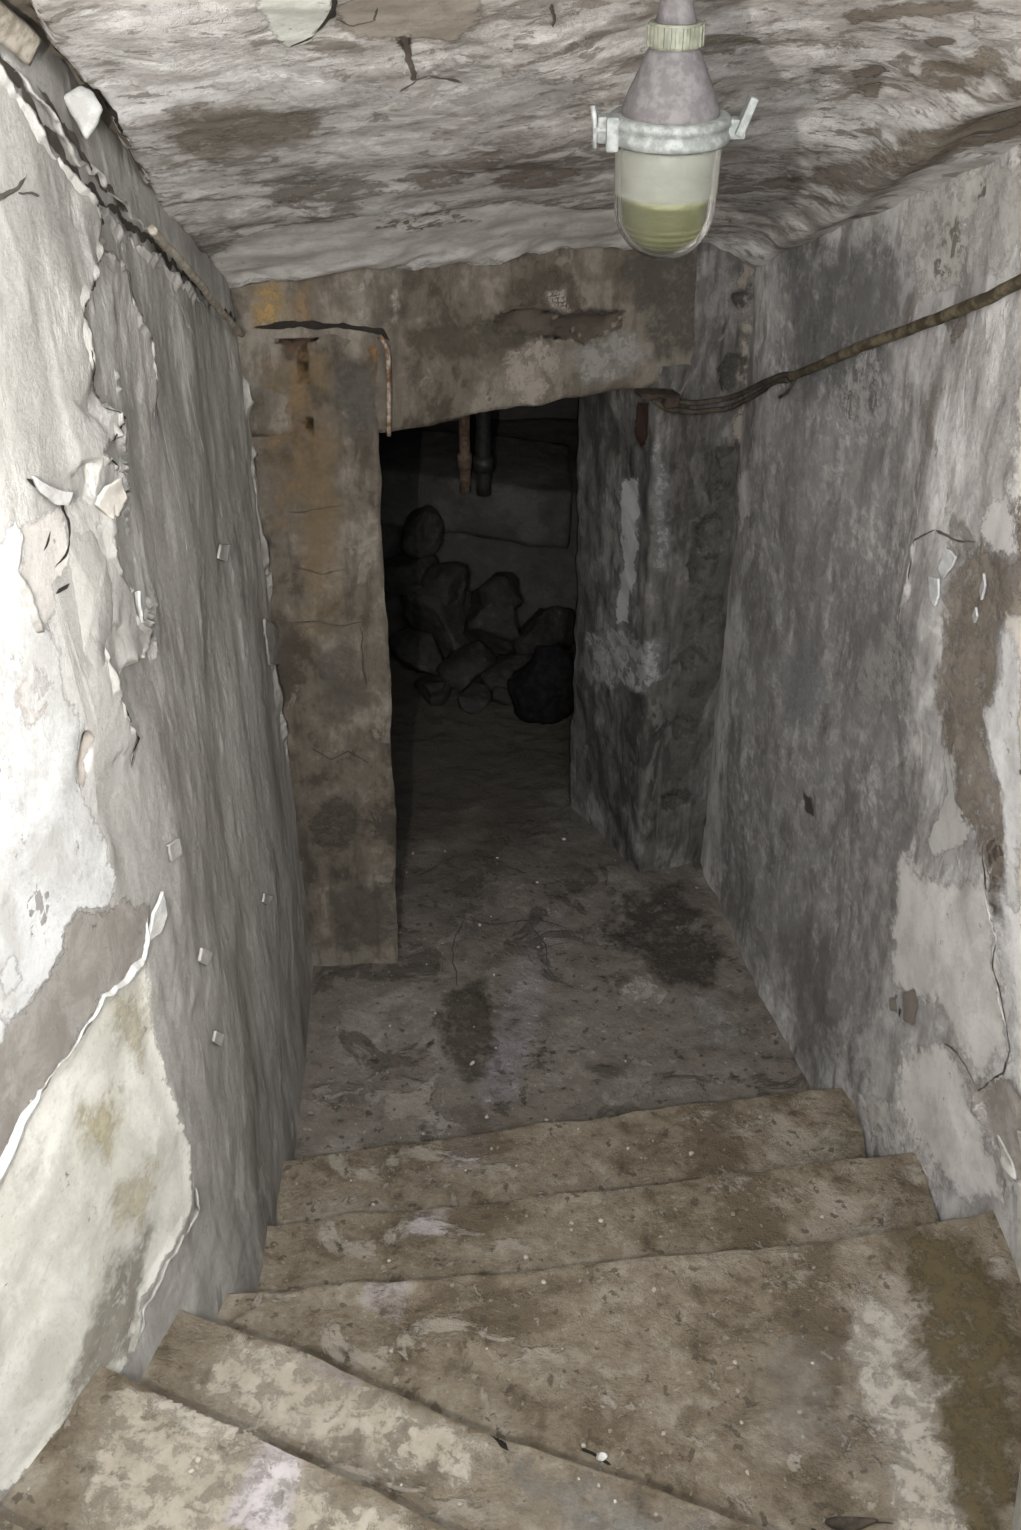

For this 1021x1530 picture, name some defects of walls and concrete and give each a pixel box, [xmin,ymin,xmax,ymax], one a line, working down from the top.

flaking render [1,0,151,185]
leakage [166,74,419,163]
flaking render [257,0,483,47]
crack [396,35,462,92]
leakage [209,160,697,406]
peeling [902,160,1021,295]
peeling [980,384,1021,562]
peeling [928,548,957,606]
peeling [972,573,987,623]
flaking render [0,506,200,1491]
flaking render [889,737,1021,1222]
spalling [151,1393,239,1441]